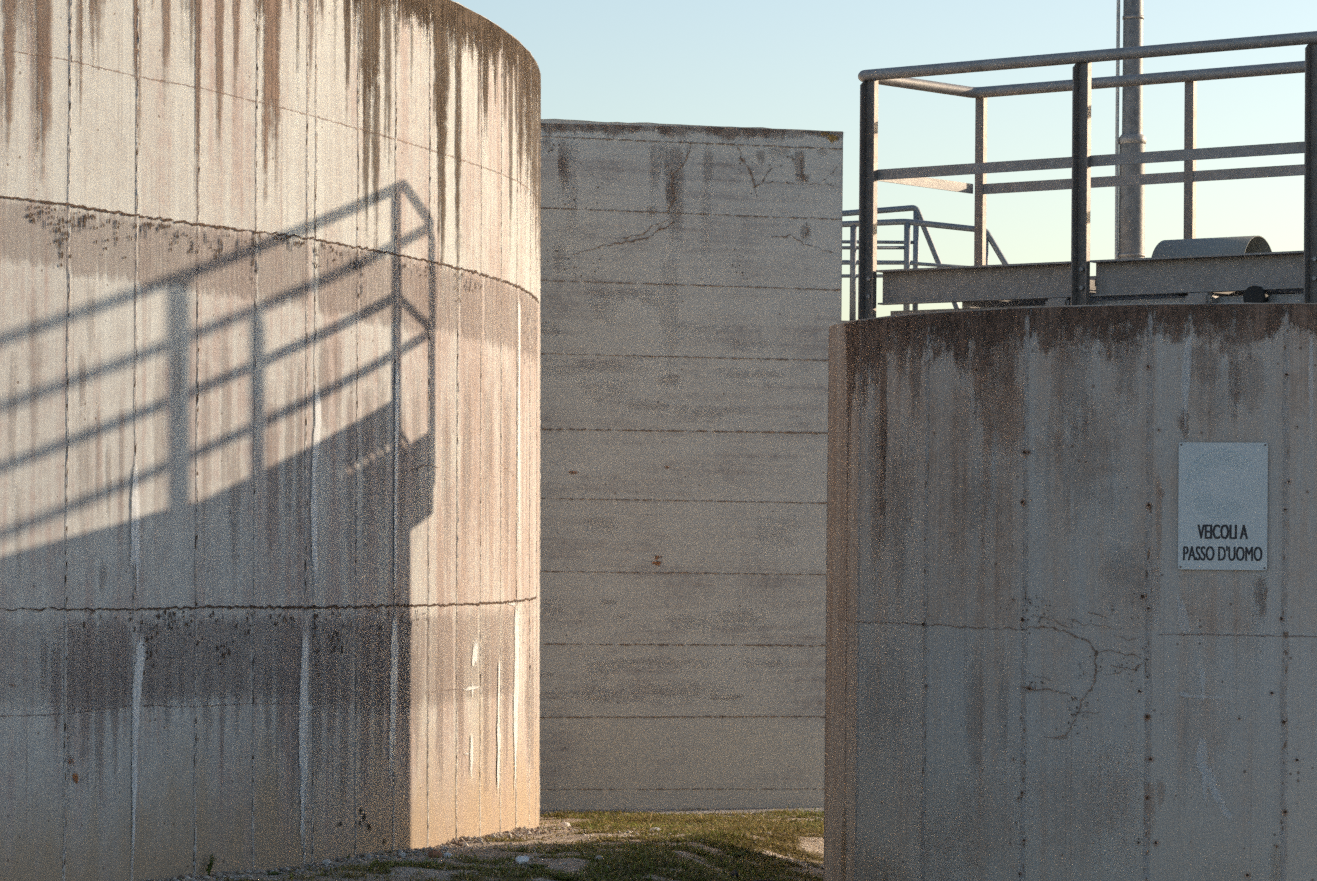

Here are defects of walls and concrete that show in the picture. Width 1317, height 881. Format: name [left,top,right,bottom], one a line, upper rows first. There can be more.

leakage [3,0,17,142]
leakage [37,0,53,170]
crack [0,49,843,303]
leakage [713,127,772,139]
leakage [72,0,640,541]
leakage [64,618,251,845]
leakage [299,636,312,841]
crack [0,570,826,612]
leakage [497,602,519,789]
crack [540,713,825,721]
crack [543,641,826,649]
crack [845,612,1317,739]